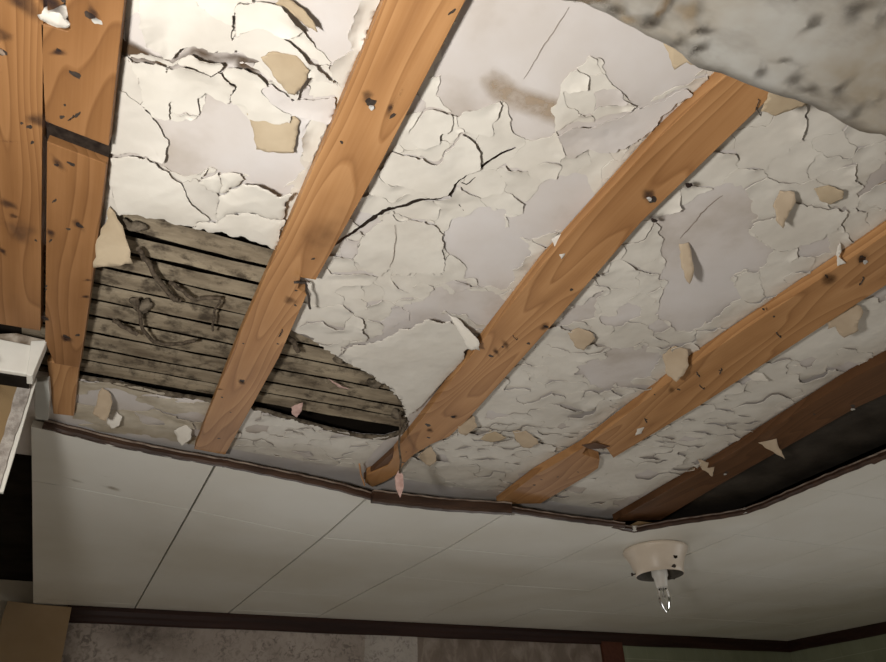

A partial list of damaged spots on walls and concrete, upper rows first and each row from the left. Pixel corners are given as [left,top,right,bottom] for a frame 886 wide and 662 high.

peeling [93,0,380,268]
crack [335,147,516,265]
peeling [228,12,714,469]
leakage [490,81,556,118]
peeling [393,104,886,510]